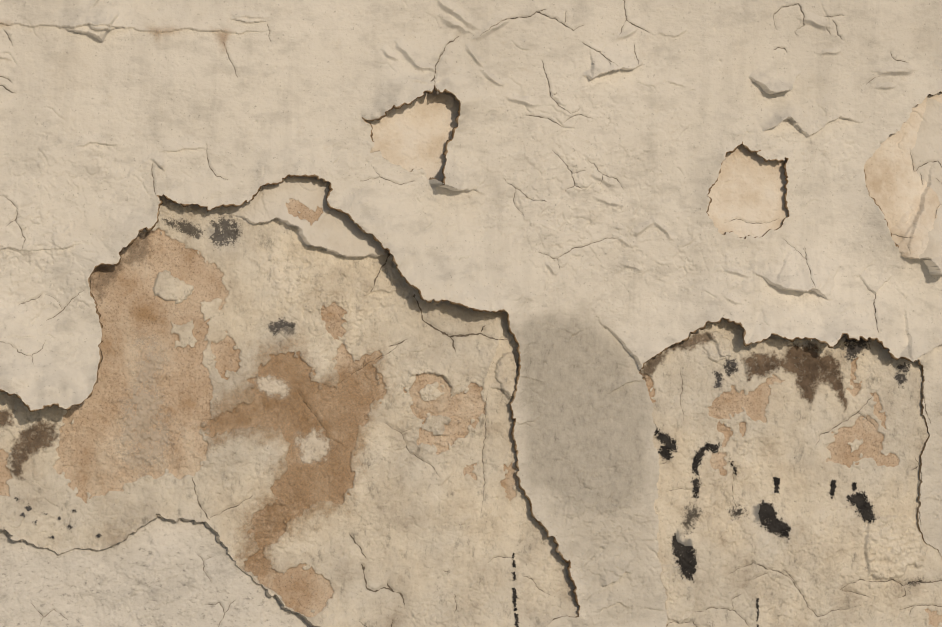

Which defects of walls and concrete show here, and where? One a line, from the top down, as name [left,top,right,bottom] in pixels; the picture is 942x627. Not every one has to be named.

peeling [358,47,468,181]
crack [505,152,621,215]
peeling [702,129,795,239]
peeling [858,92,942,267]
mould [162,216,241,246]
peeling [0,147,584,627]
leakage [640,333,713,377]
leakage [714,335,871,410]
mould [895,362,910,389]
leakage [0,411,58,478]
peeling [639,287,942,627]